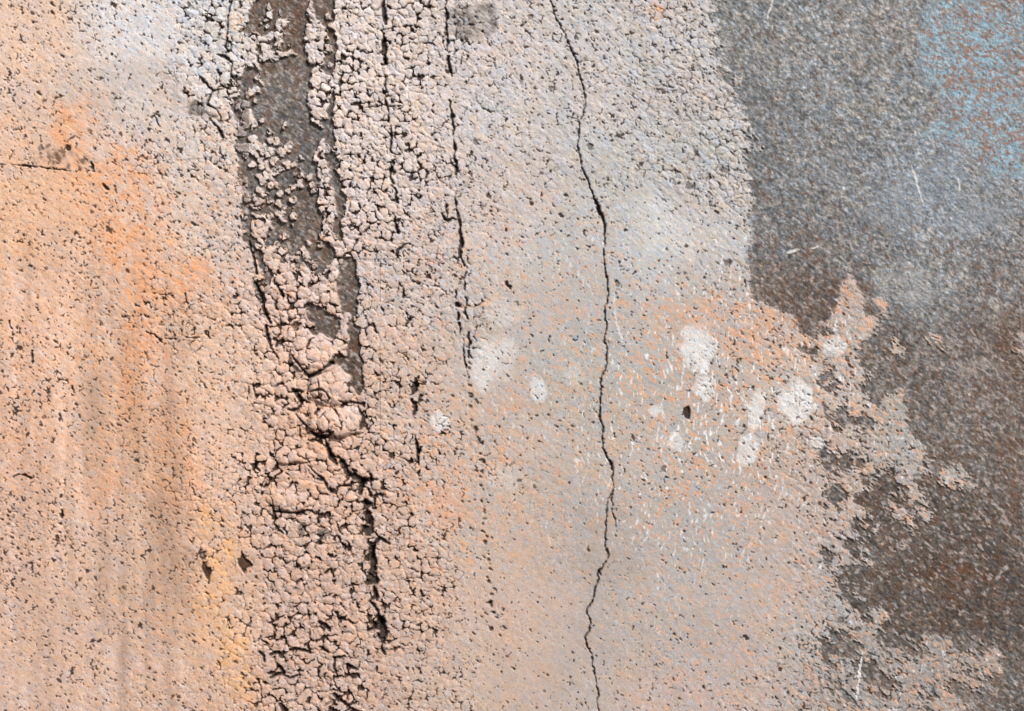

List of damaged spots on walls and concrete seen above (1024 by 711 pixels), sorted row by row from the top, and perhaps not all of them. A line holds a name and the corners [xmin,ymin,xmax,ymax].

spalling [229,0,364,396]
crack [248,240,391,711]
crack [439,0,472,382]
crack [549,0,617,711]
damp [822,123,1024,248]